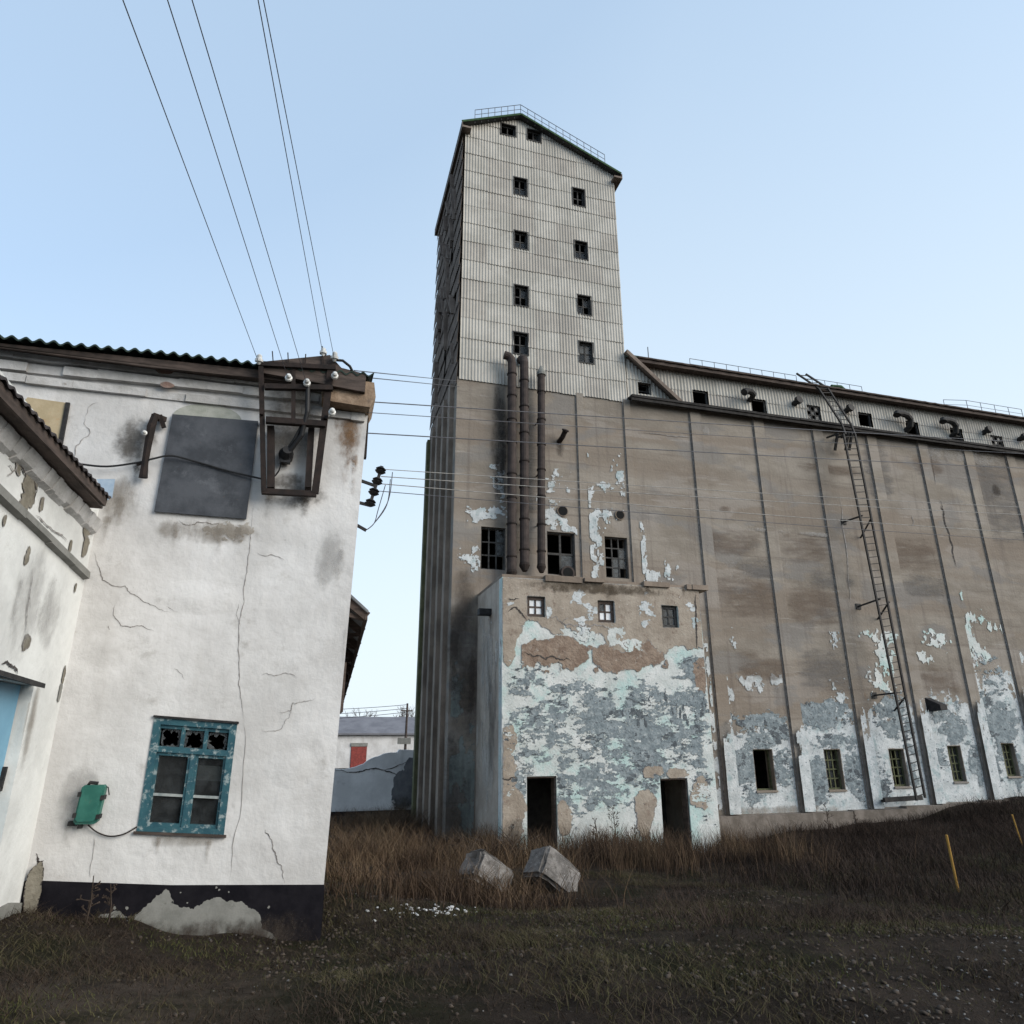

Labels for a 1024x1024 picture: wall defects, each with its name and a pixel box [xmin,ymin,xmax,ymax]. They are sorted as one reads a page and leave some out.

spalling [16,462,45,512]
spalling [69,528,91,558]
crack [94,553,178,630]
crack [229,524,310,882]
peeling [449,453,723,855]
peeling [727,672,796,810]
peeling [800,678,867,810]
peeling [859,629,922,795]
crack [931,455,957,567]
peeling [927,697,984,787]
peeling [965,608,1024,793]
peeling [98,886,274,949]